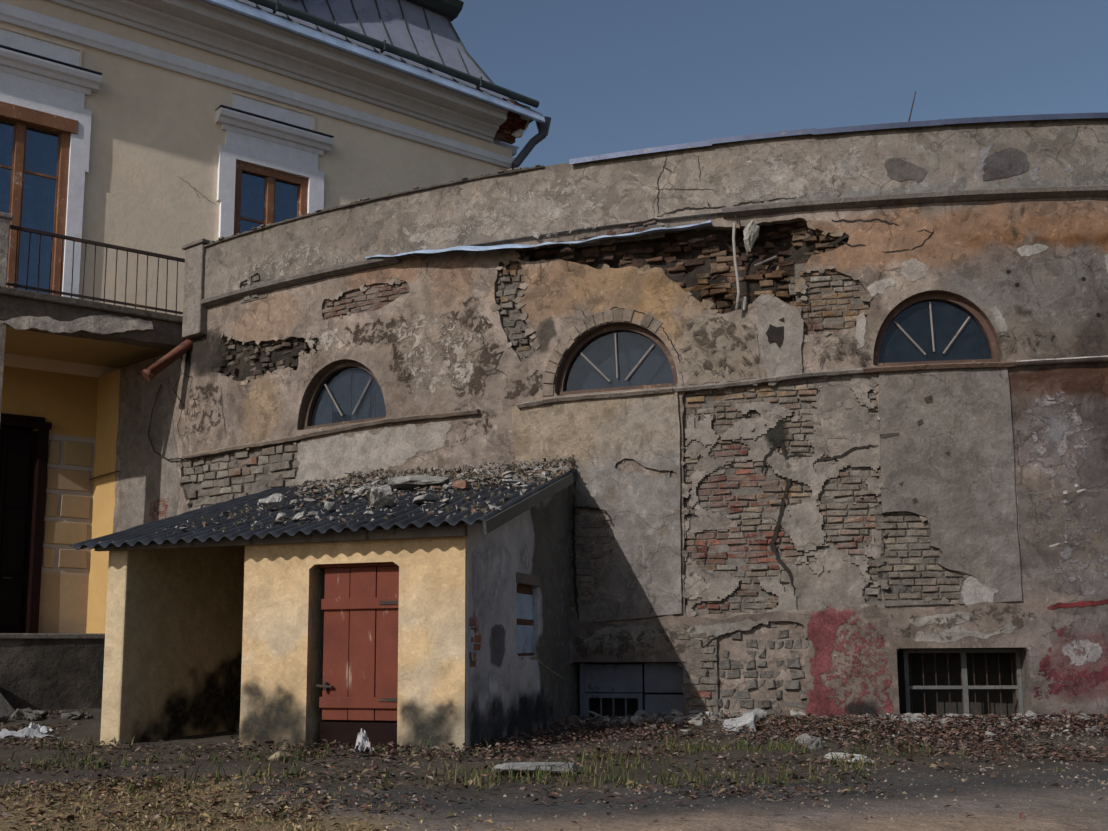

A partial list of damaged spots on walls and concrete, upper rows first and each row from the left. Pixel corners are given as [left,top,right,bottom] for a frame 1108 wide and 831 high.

flaking render [494,99,530,144]
crack [657,157,796,223]
crack [827,218,934,253]
flaking render [178,219,1036,717]
crack [761,442,878,589]
leakage [137,653,310,748]
leakage [471,486,572,748]
peeling [1033,626,1108,700]